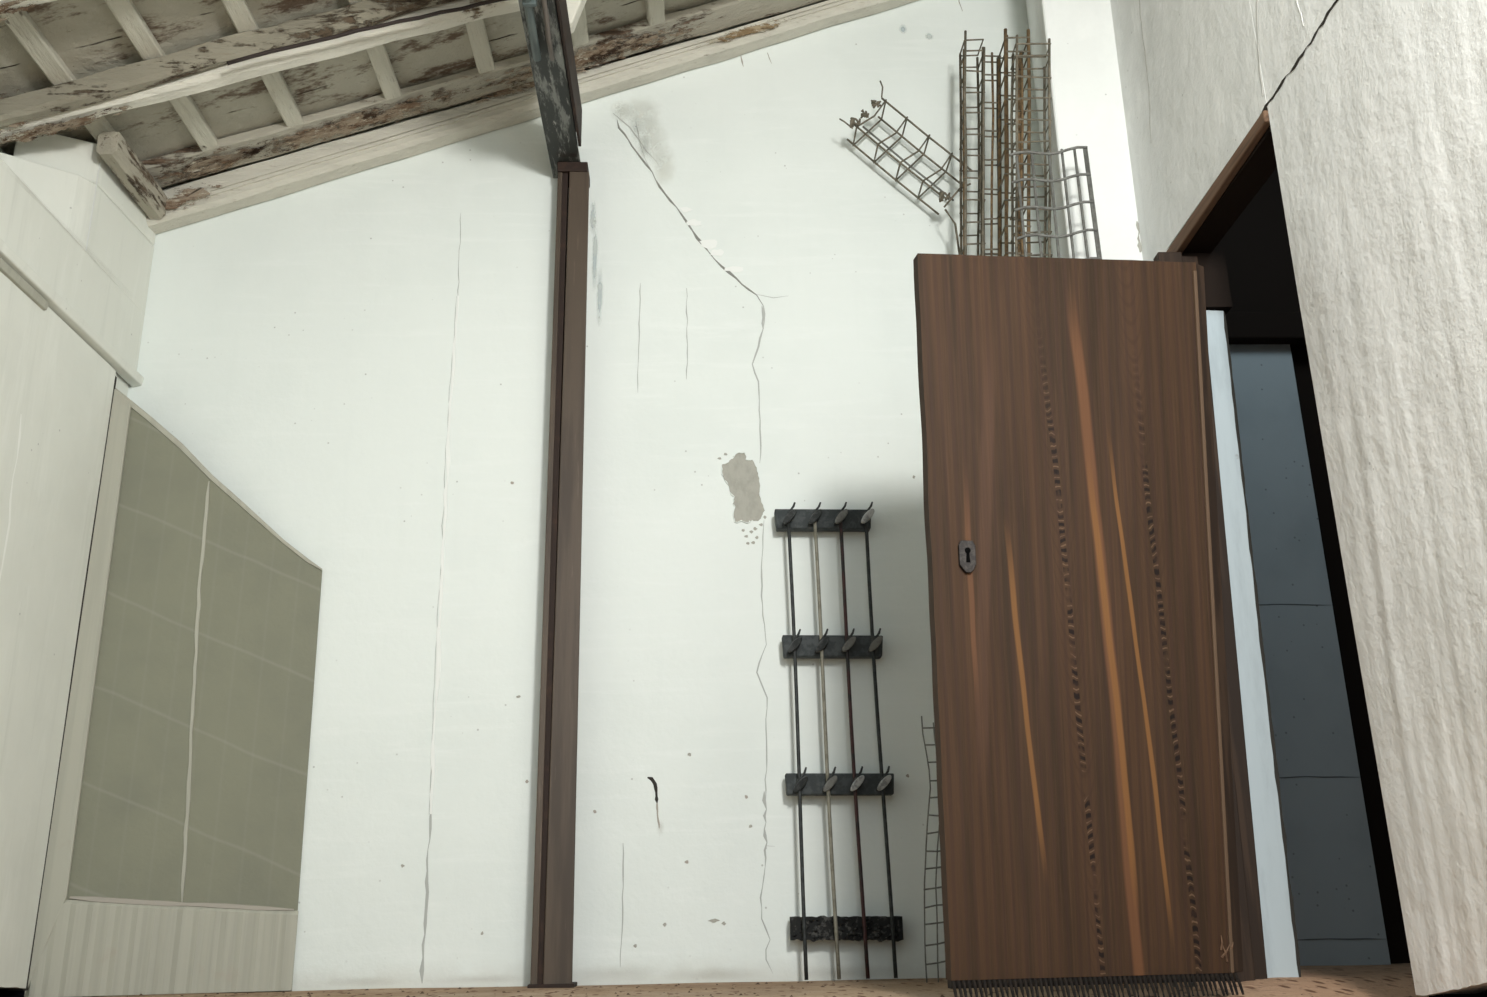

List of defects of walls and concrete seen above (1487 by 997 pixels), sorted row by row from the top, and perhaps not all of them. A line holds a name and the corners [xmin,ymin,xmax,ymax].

peeling [0,0,51,21]
peeling [574,19,787,74]
crack [1257,0,1338,115]
peeling [0,105,137,147]
peeling [154,65,535,211]
crack [613,113,784,459]
spalling [718,452,766,545]
crack [756,524,773,973]
crack [618,846,626,967]